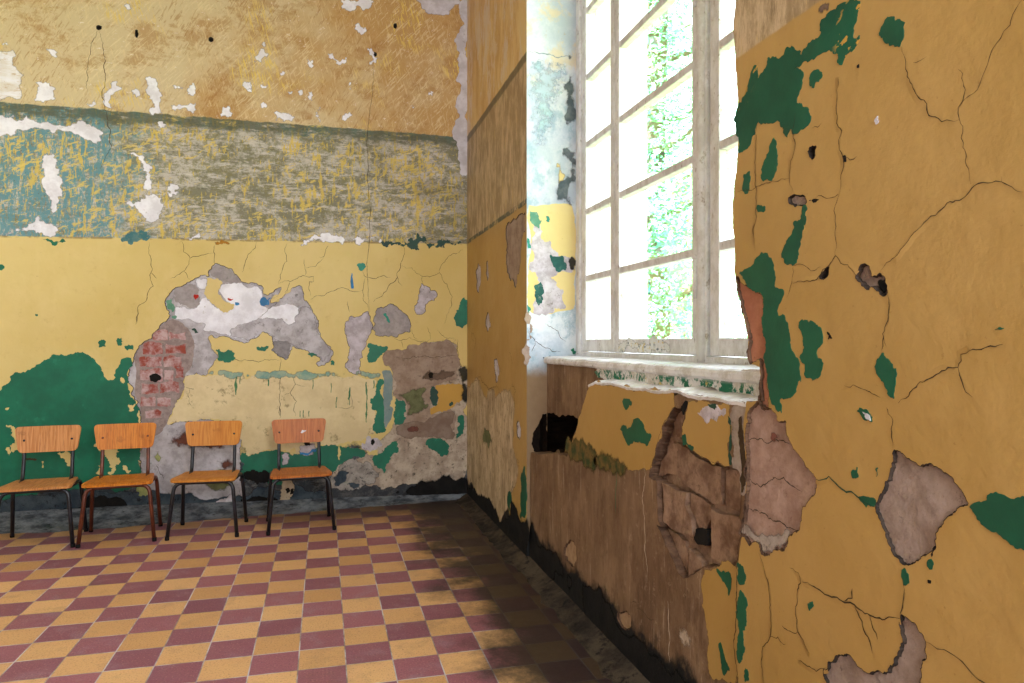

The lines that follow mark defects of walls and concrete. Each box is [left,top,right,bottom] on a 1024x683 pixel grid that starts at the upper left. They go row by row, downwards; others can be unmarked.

peeling [0,42,55,102]
peeling [9,154,66,246]
peeling [0,115,103,144]
peeling [121,152,179,245]
peeling [734,0,860,194]
crack [738,1,1023,351]
crack [136,241,215,322]
flaking render [0,194,832,683]
leakage [396,475,685,683]
crack [733,553,905,683]
flaking render [823,614,927,683]
flaking render [858,449,1024,586]